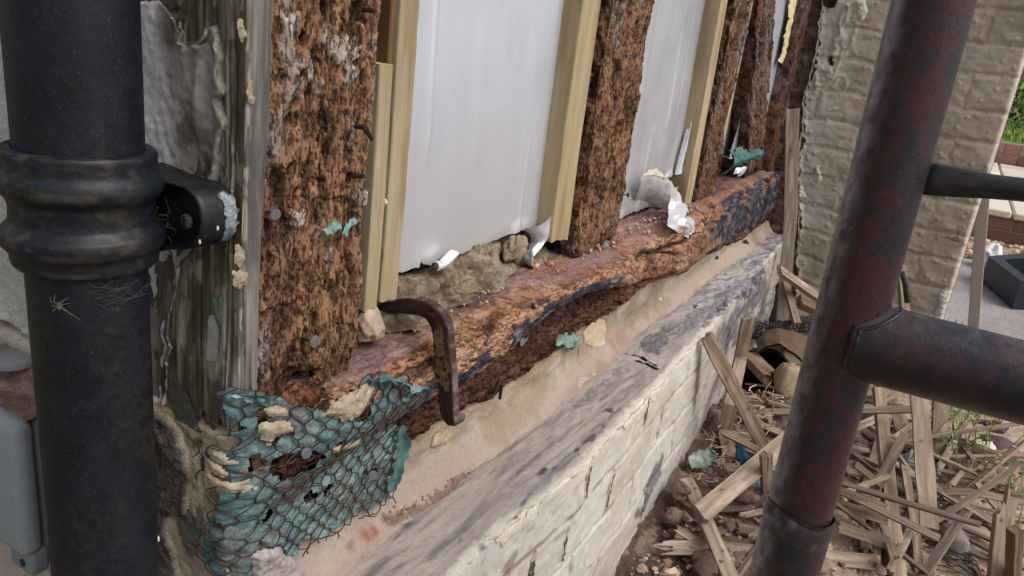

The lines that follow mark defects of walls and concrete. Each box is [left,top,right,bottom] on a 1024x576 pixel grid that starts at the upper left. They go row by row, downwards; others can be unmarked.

peeling [159,0,225,171]
crack [626,353,660,369]